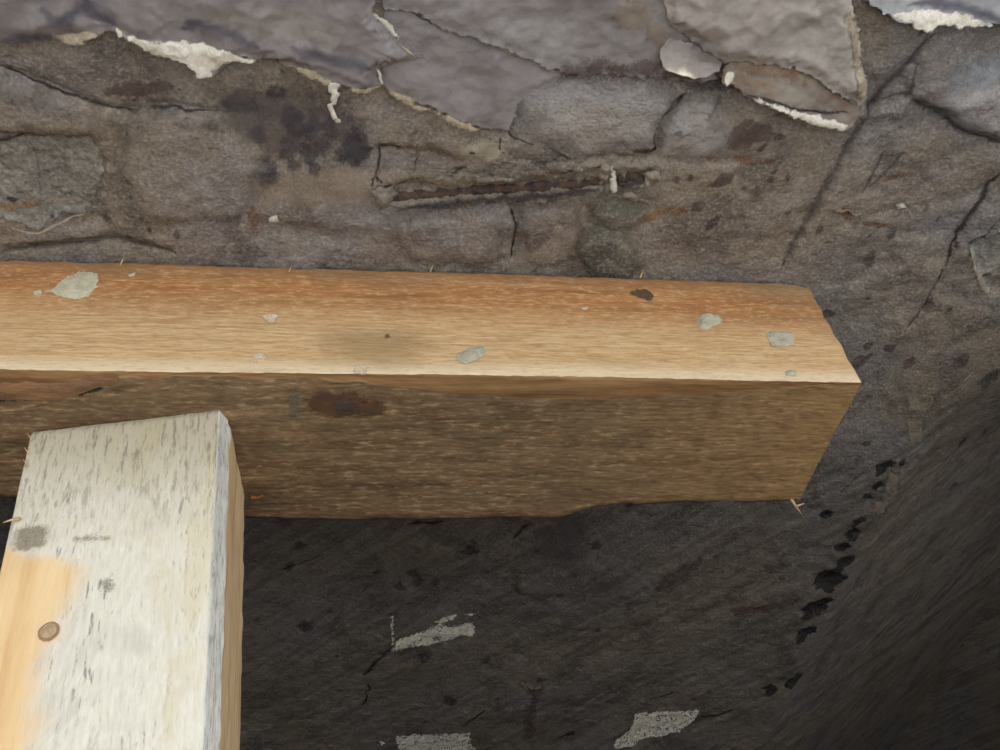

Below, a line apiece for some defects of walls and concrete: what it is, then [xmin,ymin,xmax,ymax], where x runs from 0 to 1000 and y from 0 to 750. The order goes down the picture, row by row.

damp [220,84,358,154]
peeling [0,0,868,133]